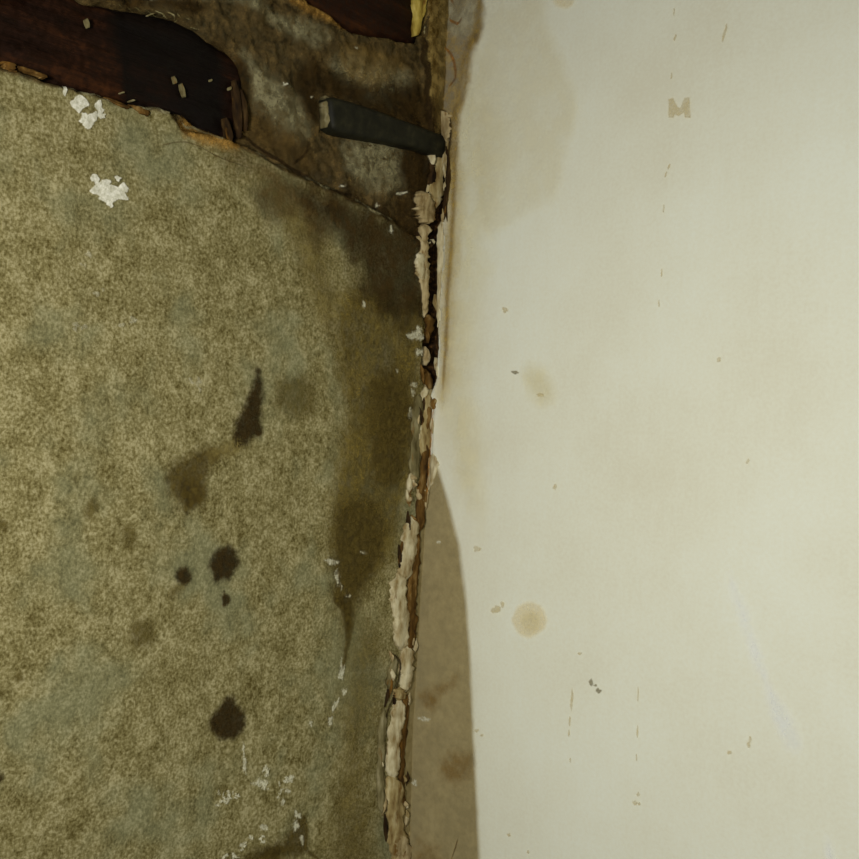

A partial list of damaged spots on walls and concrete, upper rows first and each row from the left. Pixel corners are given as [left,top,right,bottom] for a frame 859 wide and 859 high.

spalling [0,68,108,100]
damp [166,368,263,511]
spalling [74,0,478,859]
damp [261,150,430,667]
damp [176,567,191,588]
damp [210,546,239,581]
damp [210,697,245,740]
damp [253,766,293,804]